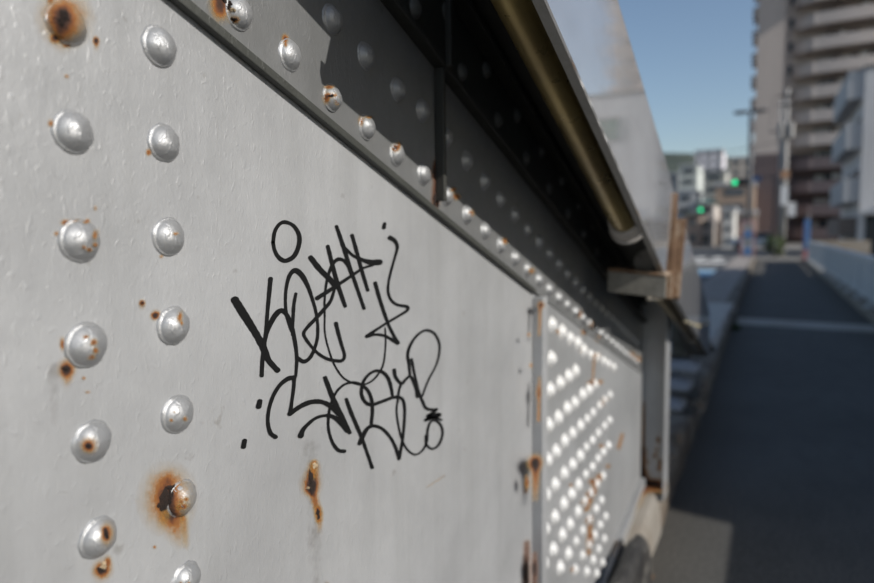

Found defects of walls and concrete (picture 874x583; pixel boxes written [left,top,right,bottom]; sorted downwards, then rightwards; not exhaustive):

rust [46,0,82,47]
rust [212,0,239,23]
rust [60,361,85,380]
rust [82,440,94,452]
rust [150,472,188,534]
rust [304,461,322,524]
rust [101,526,111,541]
rust [523,542,538,583]